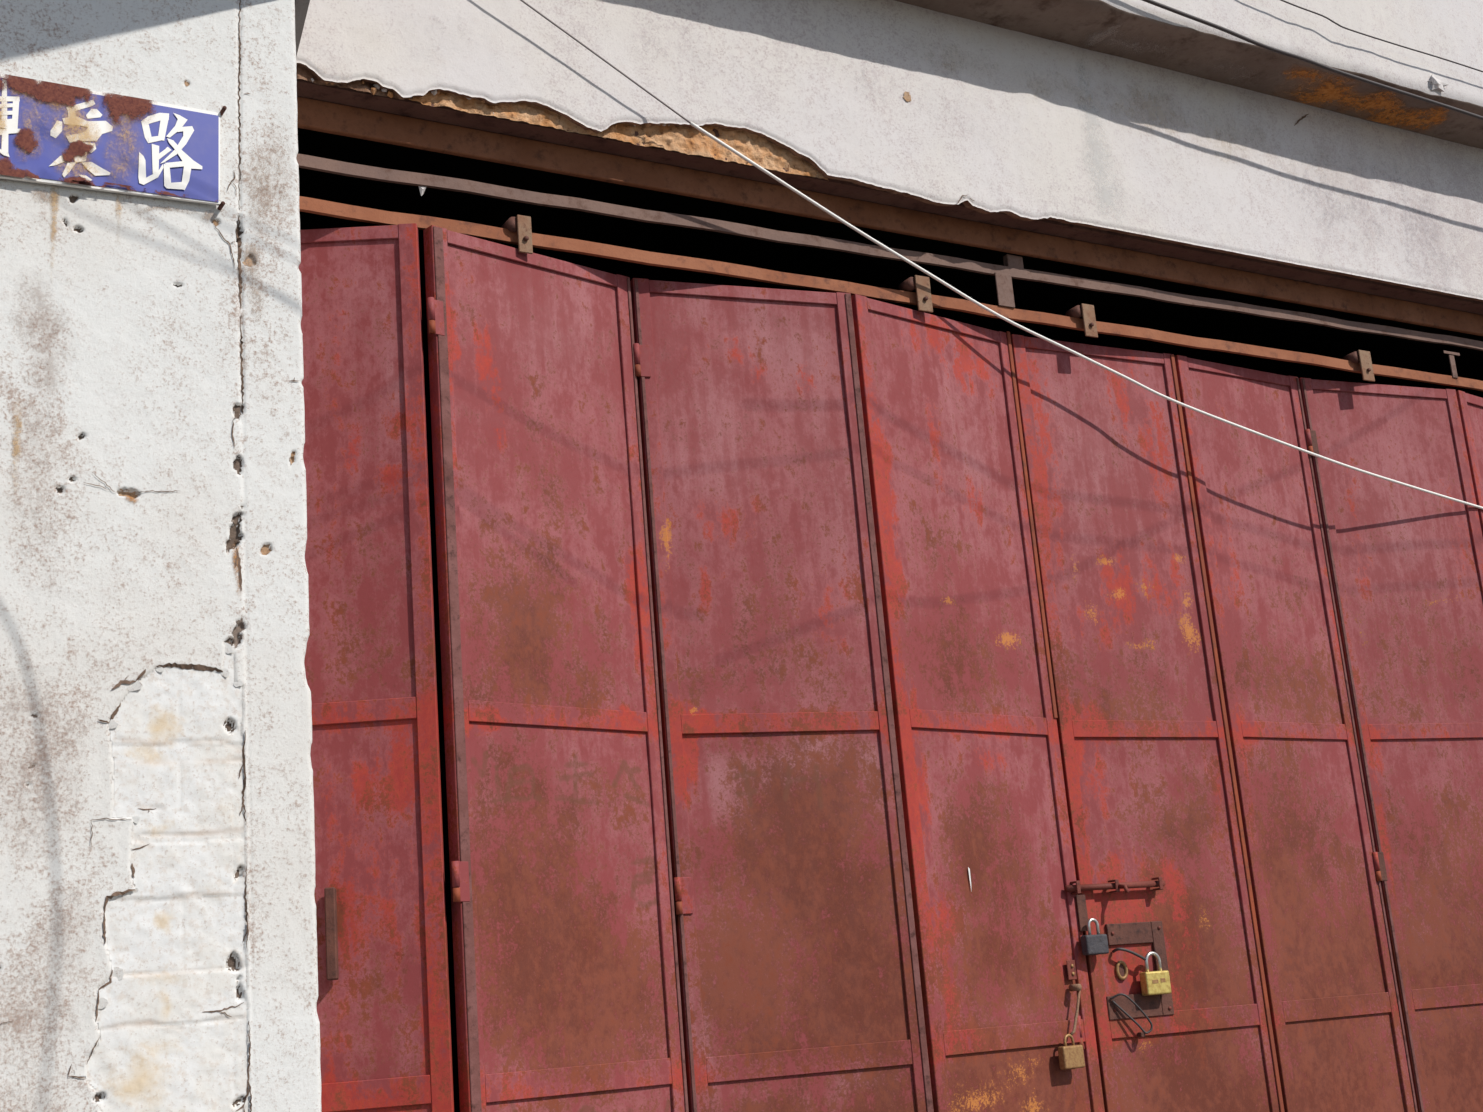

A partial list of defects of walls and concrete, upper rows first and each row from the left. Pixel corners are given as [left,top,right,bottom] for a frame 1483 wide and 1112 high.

spalling [297,65,828,180]
corrosion [1284,69,1449,129]
peeling [72,618,250,1112]